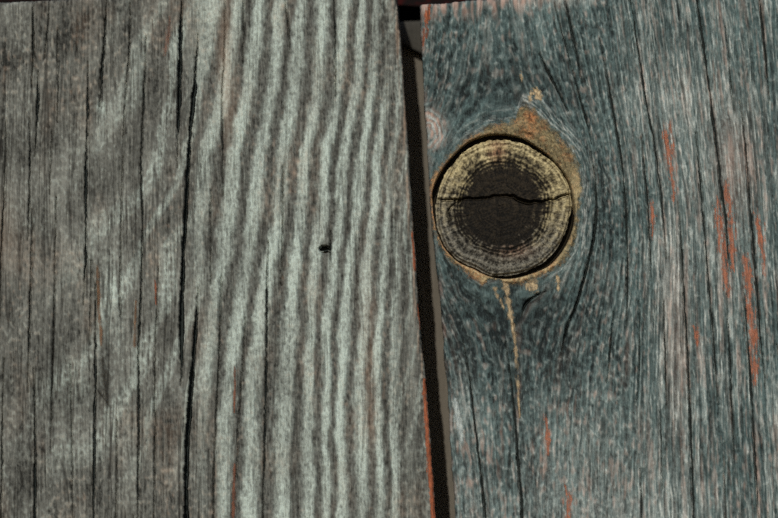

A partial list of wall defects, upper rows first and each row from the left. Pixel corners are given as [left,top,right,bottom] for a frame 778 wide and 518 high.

crack [0,123,8,287]
crack [0,365,8,518]
crack [27,7,73,518]
crack [83,2,107,518]
crack [112,419,120,490]
crack [119,27,158,518]
crack [177,2,221,518]
crack [222,0,244,85]
crack [262,187,283,518]
crack [463,343,486,518]
crack [433,136,574,278]
crack [539,2,597,356]